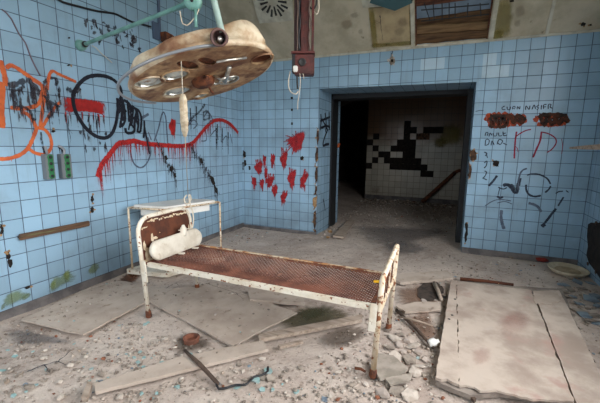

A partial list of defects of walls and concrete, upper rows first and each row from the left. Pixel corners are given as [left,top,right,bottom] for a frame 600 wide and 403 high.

spalling [468,148,478,179]
spalling [417,282,447,302]
water stain [283,306,346,327]